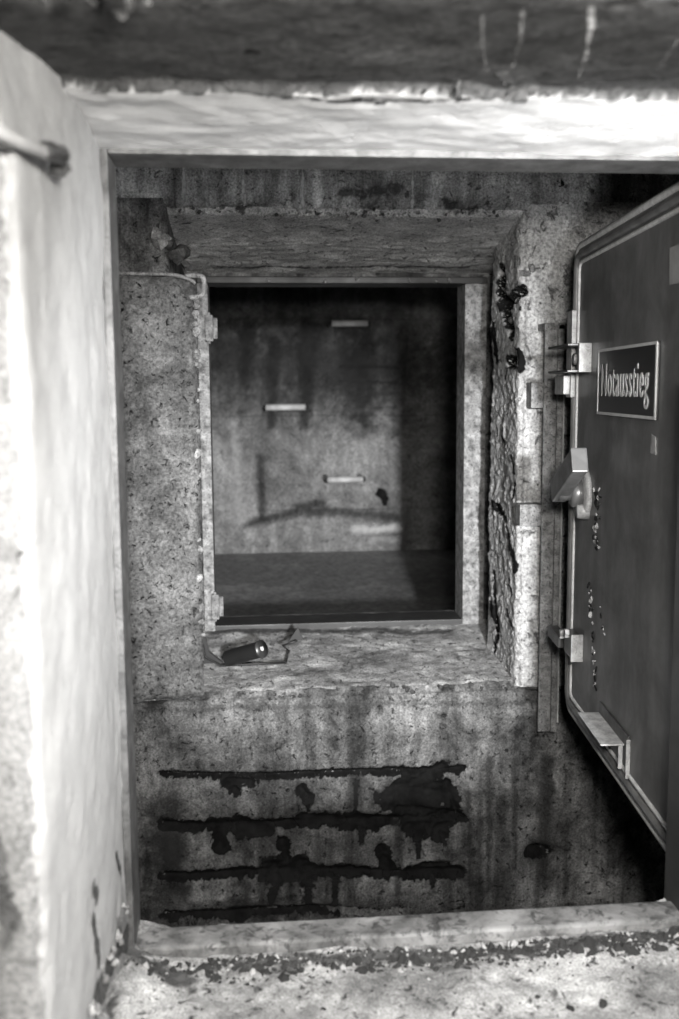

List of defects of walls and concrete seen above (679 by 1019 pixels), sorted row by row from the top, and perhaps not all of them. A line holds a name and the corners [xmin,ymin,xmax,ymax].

spalling [489,263,535,373]
flaking render [491,492,519,574]
flaking render [489,570,500,653]
damp [151,800,403,927]